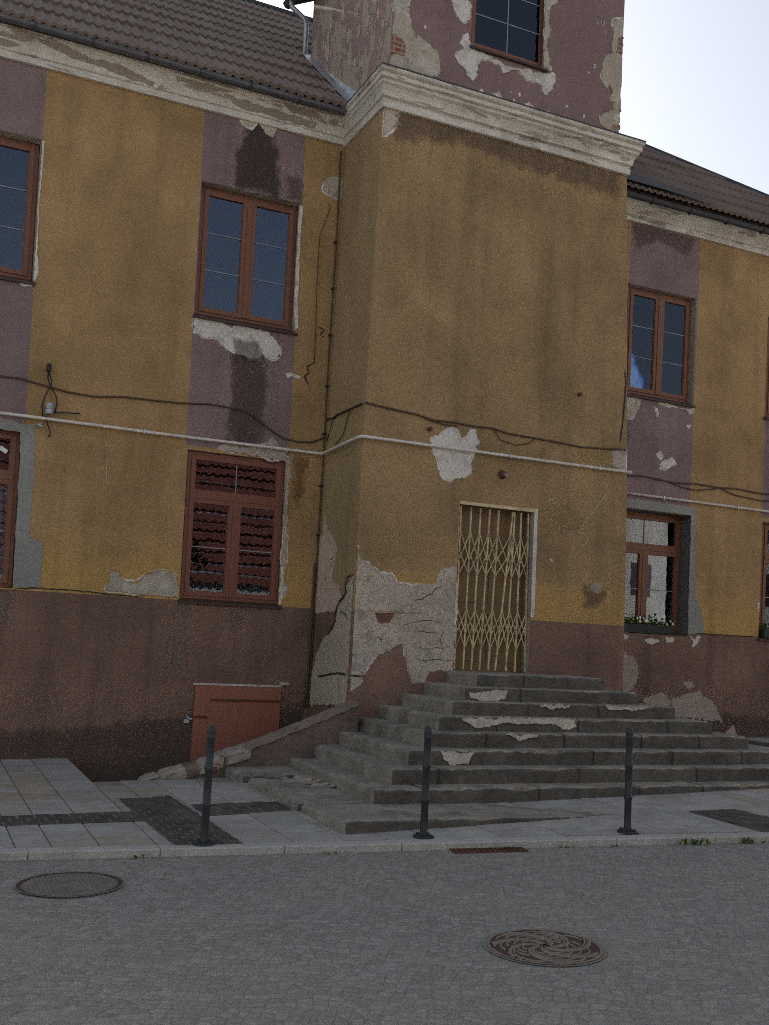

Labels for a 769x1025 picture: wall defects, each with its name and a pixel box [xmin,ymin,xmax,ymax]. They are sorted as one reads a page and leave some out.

flaking render [450,0,558,107]
spalling [588,17,624,133]
water stain [236,124,279,197]
flaking render [191,318,282,361]
water stain [229,355,265,444]
flaking render [430,426,480,482]
flaking render [104,568,180,598]
crack [328,575,351,634]
flaking render [309,515,458,707]
crack [378,586,451,661]
crack [317,670,365,678]
spalling [462,703,577,741]